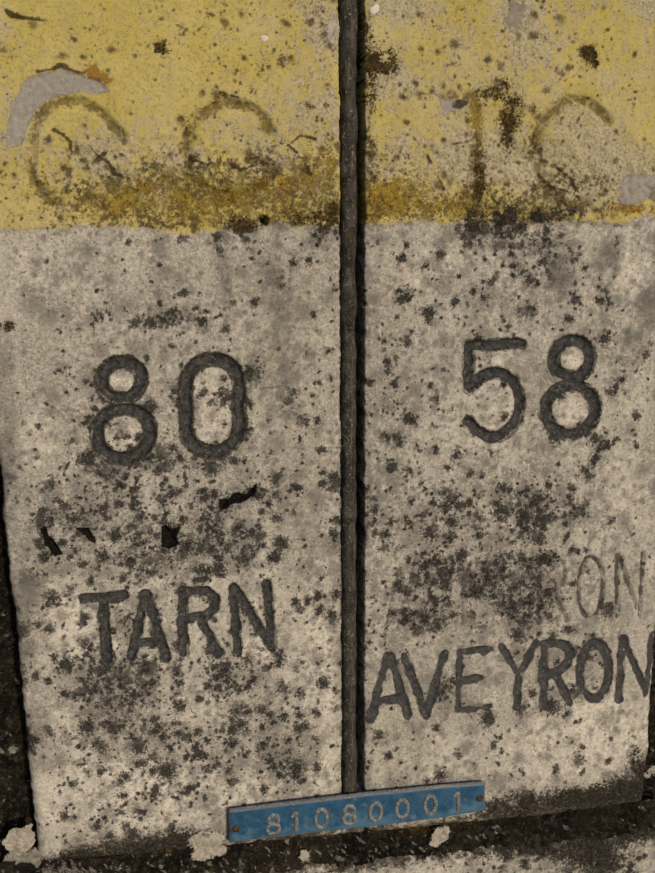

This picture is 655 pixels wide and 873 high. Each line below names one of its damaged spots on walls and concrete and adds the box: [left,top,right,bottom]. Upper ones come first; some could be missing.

peeling [6,63,113,148]
peeling [615,172,655,208]
water stain [464,735,646,820]